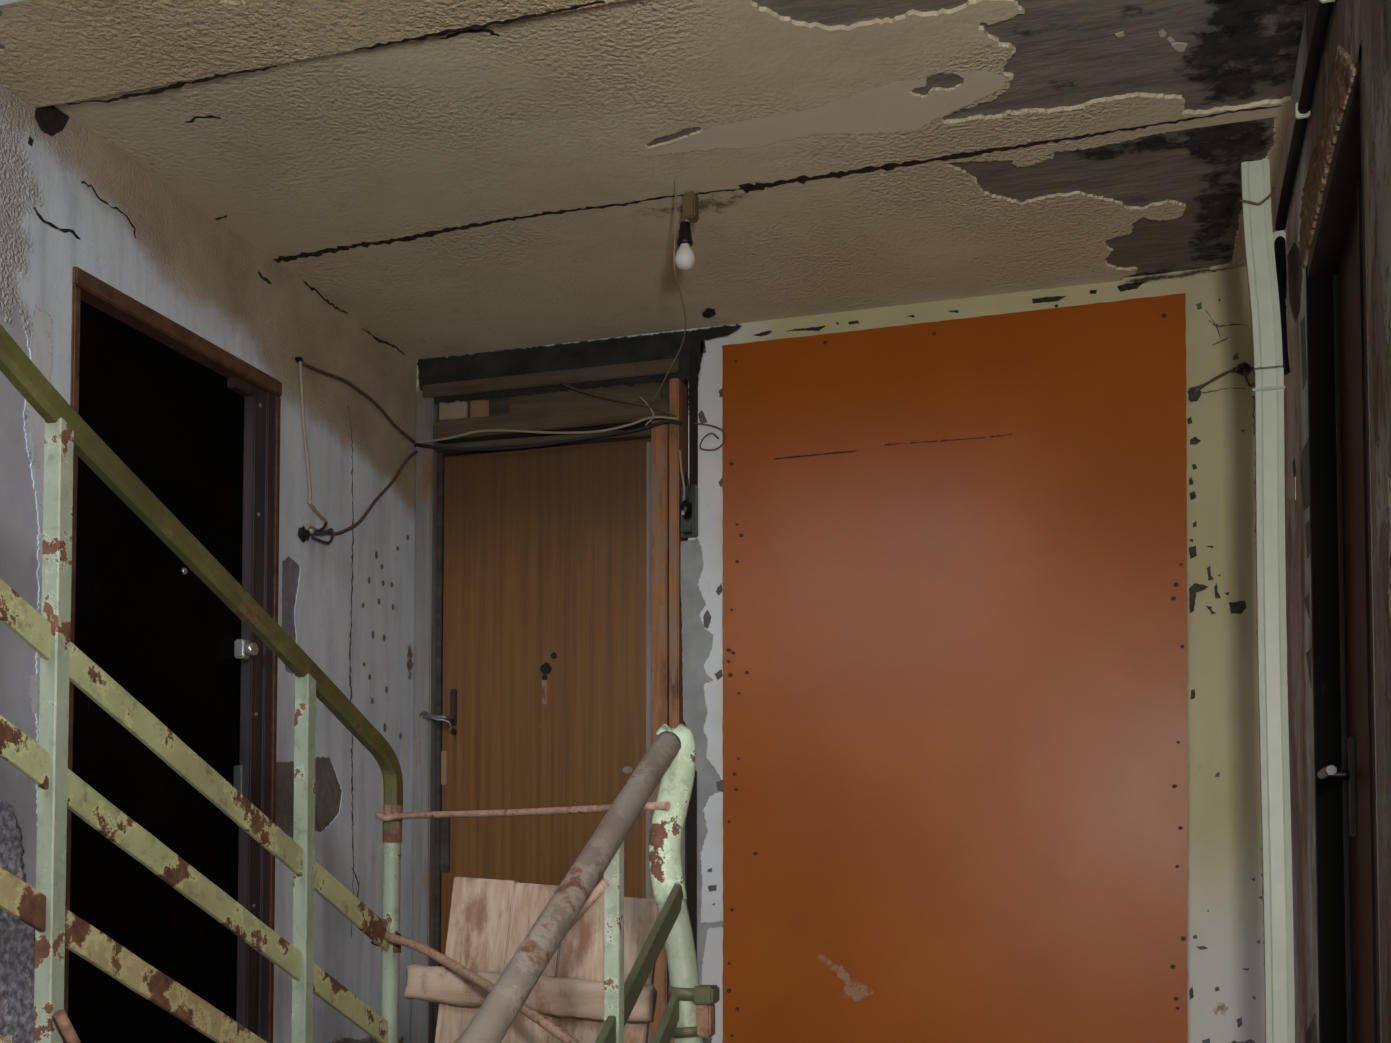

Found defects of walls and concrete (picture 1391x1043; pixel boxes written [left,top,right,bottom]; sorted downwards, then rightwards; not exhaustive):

crack [66,66,277,123]
crack [354,1,604,51]
spalling [752,0,968,26]
spalling [943,0,1307,292]
mould [1183,0,1308,104]
crack [34,207,80,240]
crack [81,181,136,238]
crack [258,105,1281,355]
water stain [1073,121,1272,284]
flaking render [0,371,39,610]
spalling [1189,521,1247,614]
flaking render [681,539,723,985]